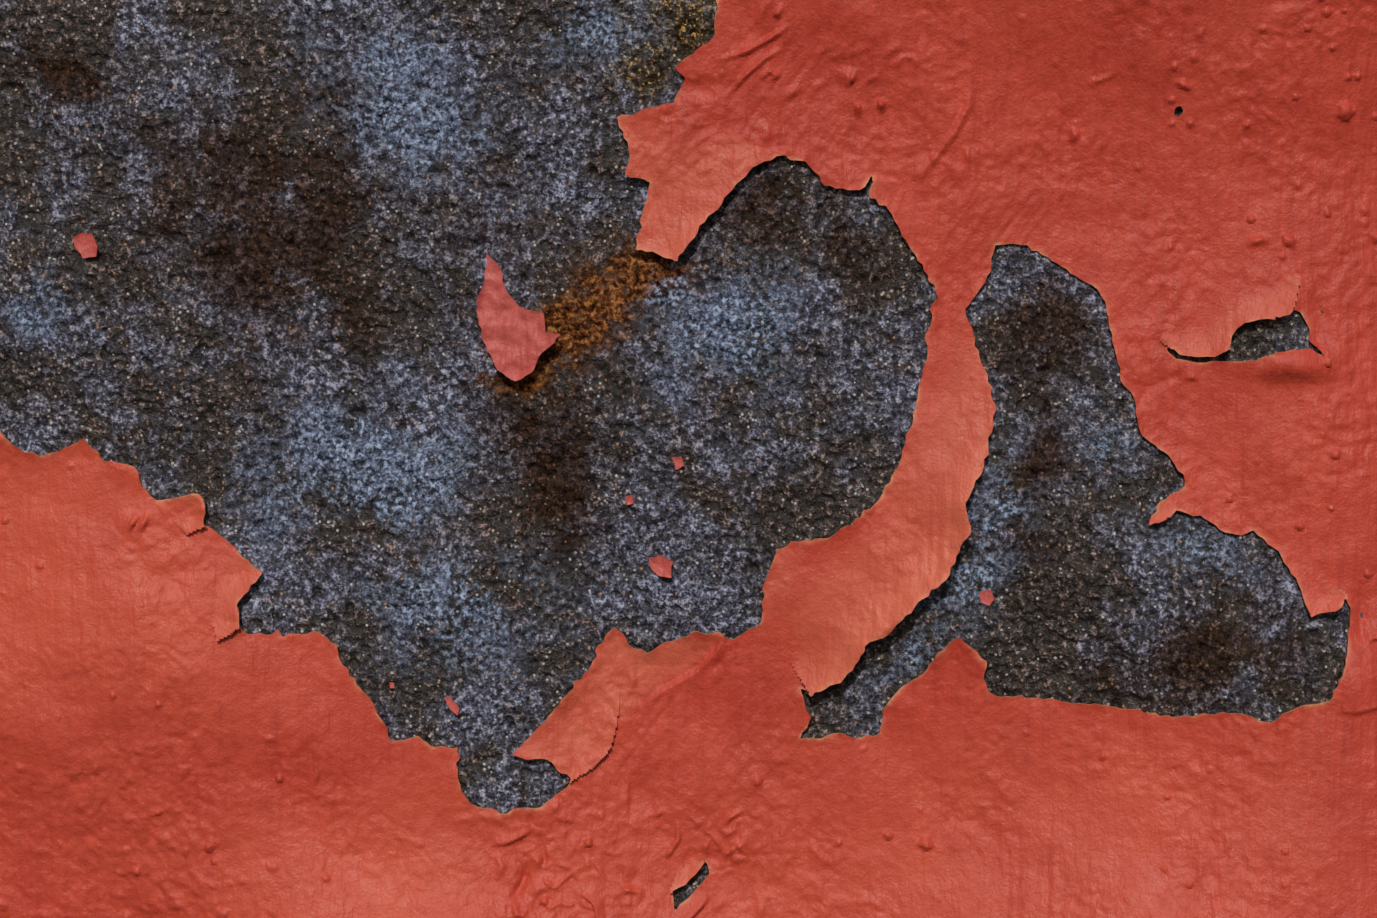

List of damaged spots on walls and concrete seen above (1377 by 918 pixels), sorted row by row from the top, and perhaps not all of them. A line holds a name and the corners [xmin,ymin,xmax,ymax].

peeling [0,0,938,813]
rust [505,251,678,386]
peeling [745,244,1350,738]
peeling [673,862,709,909]